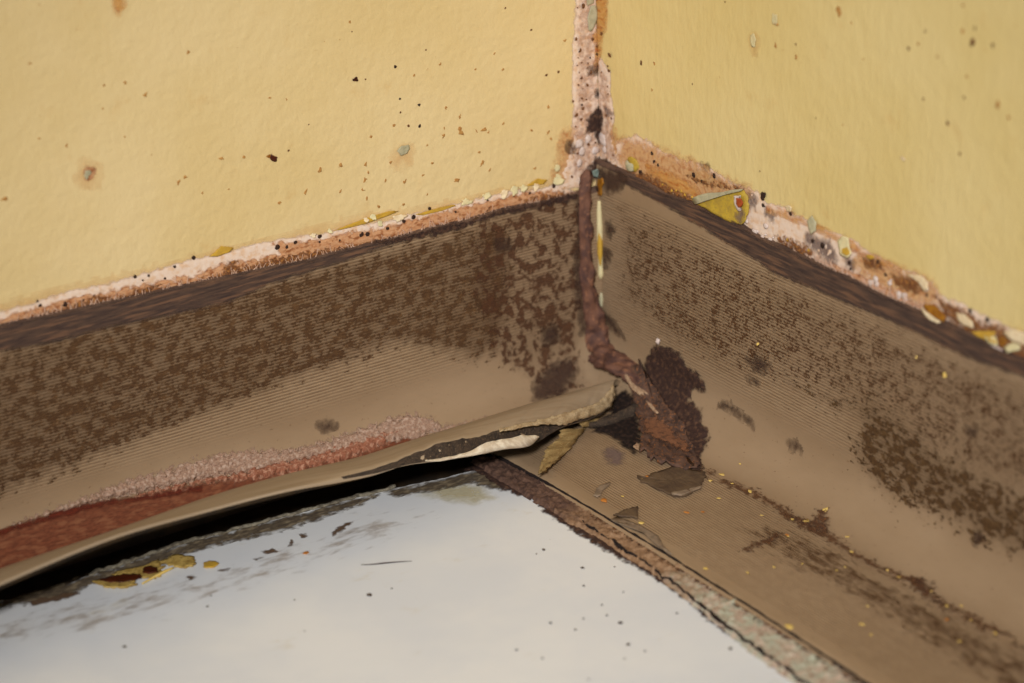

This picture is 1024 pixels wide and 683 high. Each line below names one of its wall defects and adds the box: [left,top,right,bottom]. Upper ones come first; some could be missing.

peeling [0,0,1024,358]
damp [12,411,484,526]
damp [0,194,584,498]
damp [538,505,725,633]
rust [642,417,688,451]
damp [595,169,1024,561]